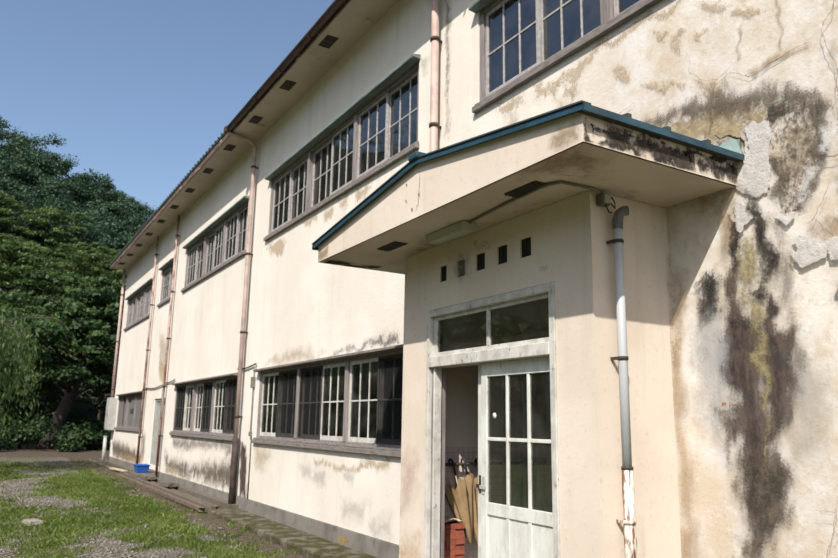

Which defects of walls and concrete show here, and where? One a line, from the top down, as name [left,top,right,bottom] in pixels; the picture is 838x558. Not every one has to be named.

leakage [702,3,760,18]
leakage [534,0,683,101]
crack [689,0,838,116]
leakage [583,121,738,183]
crack [709,109,745,172]
leakage [644,79,829,206]
spalling [654,99,838,233]
leakage [337,333,398,353]
leakage [694,190,805,558]
leakage [112,441,140,463]
leakage [165,438,248,498]
leakage [680,484,694,558]